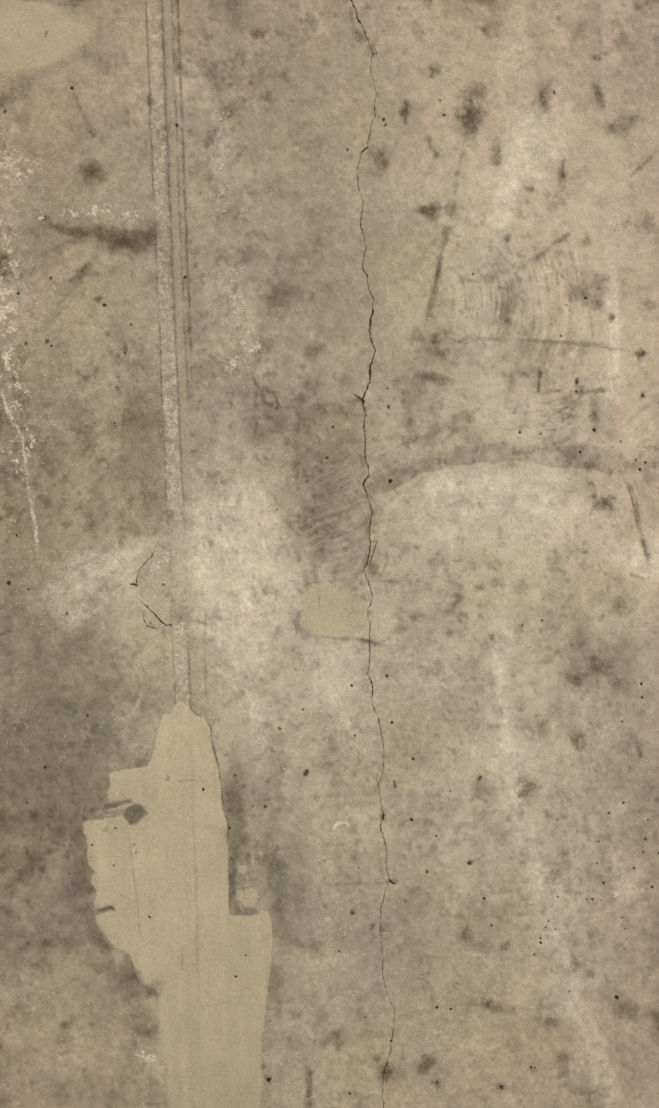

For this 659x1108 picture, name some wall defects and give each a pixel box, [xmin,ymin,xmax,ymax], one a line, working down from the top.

crack [354,100,382,734]
peeling [235,831,266,909]